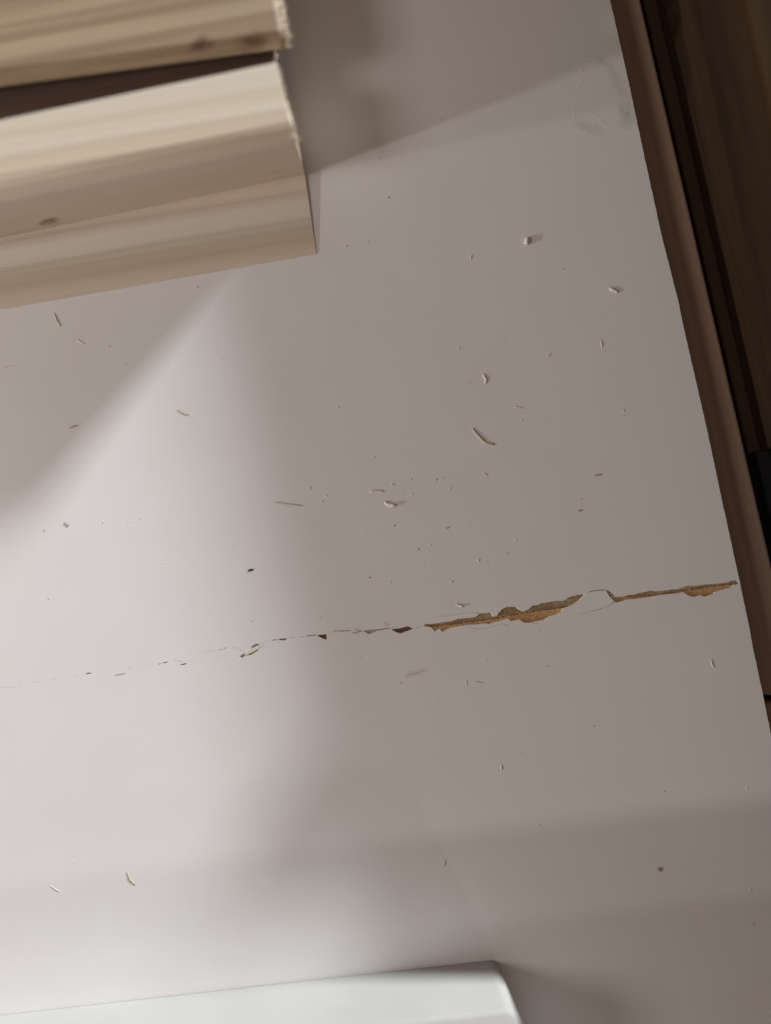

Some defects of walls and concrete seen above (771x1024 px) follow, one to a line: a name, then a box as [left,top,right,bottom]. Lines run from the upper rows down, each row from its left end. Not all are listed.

peeling [392,580,740,634]
crack [118,626,441,675]